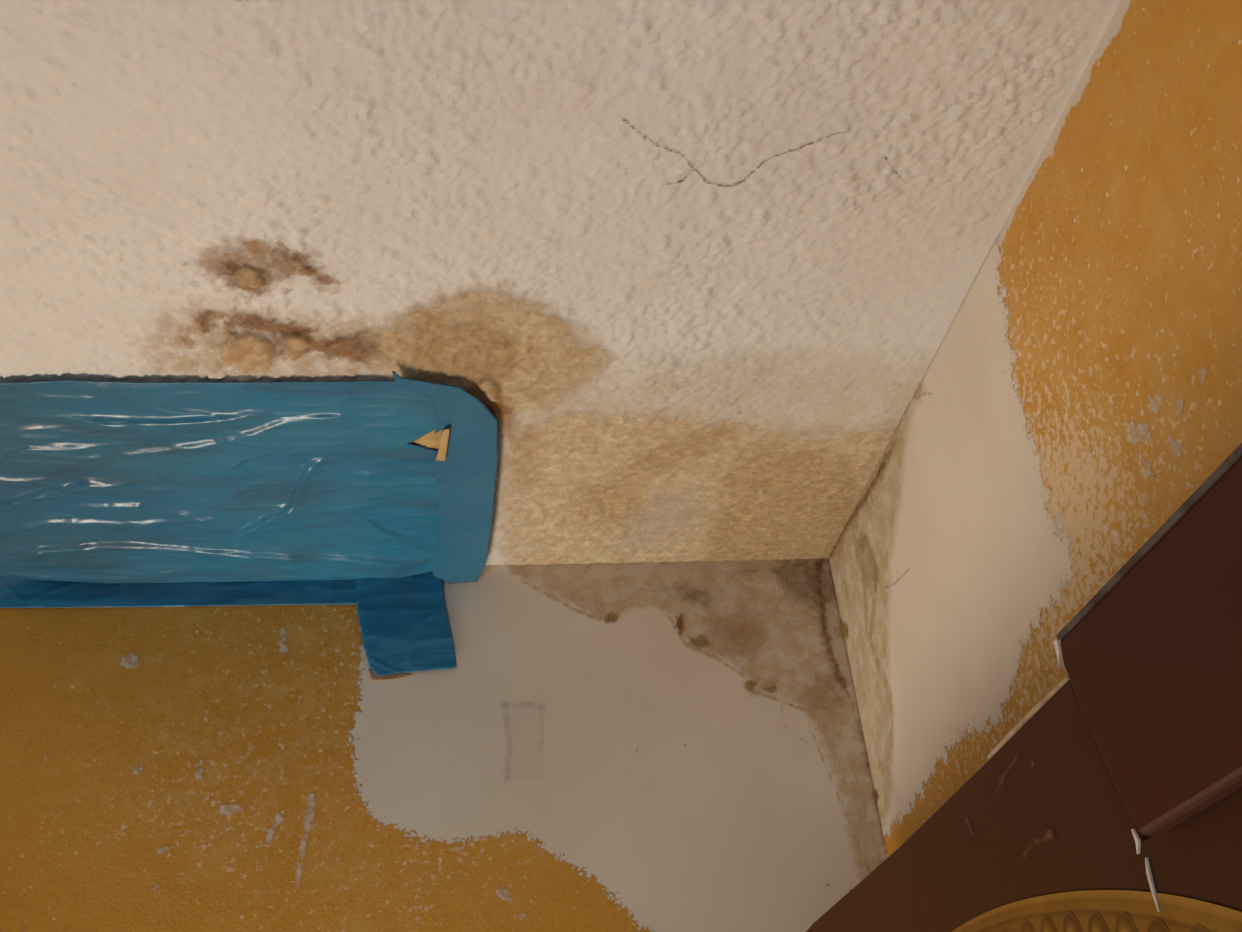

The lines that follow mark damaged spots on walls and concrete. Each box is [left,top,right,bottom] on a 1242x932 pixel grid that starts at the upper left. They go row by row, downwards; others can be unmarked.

damp [199,241,338,294]
damp [176,292,903,872]
peeling [346,234,1080,932]